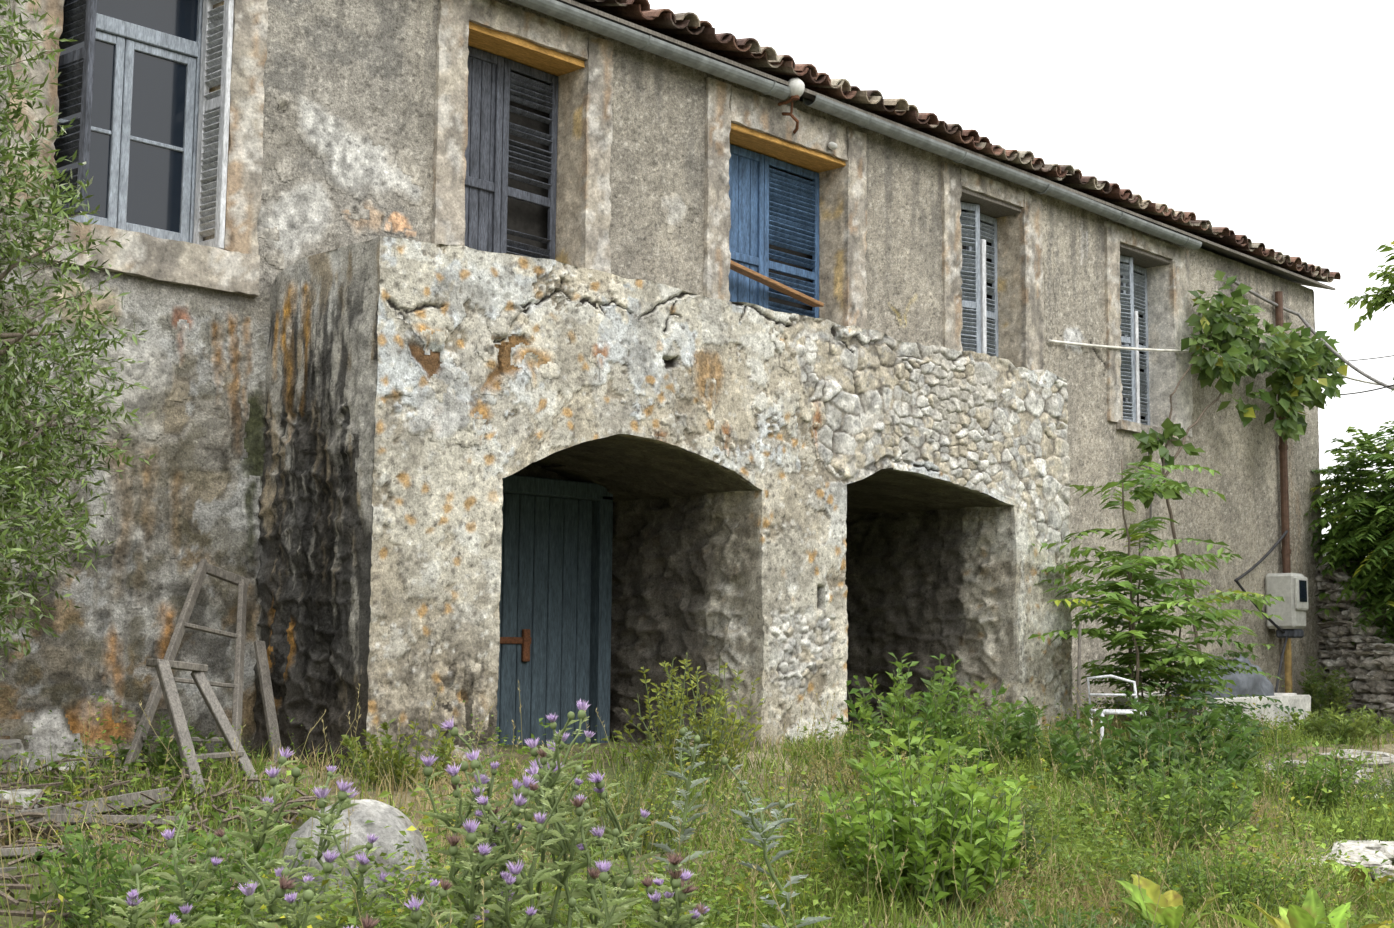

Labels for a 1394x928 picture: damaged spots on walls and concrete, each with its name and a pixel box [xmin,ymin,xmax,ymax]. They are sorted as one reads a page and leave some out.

rust [168,302,255,460]
rust [271,277,314,460]
crack [386,296,446,324]
crack [493,277,793,345]
crack [830,322,856,356]
leakage [241,343,360,766]
leakage [365,629,498,777]